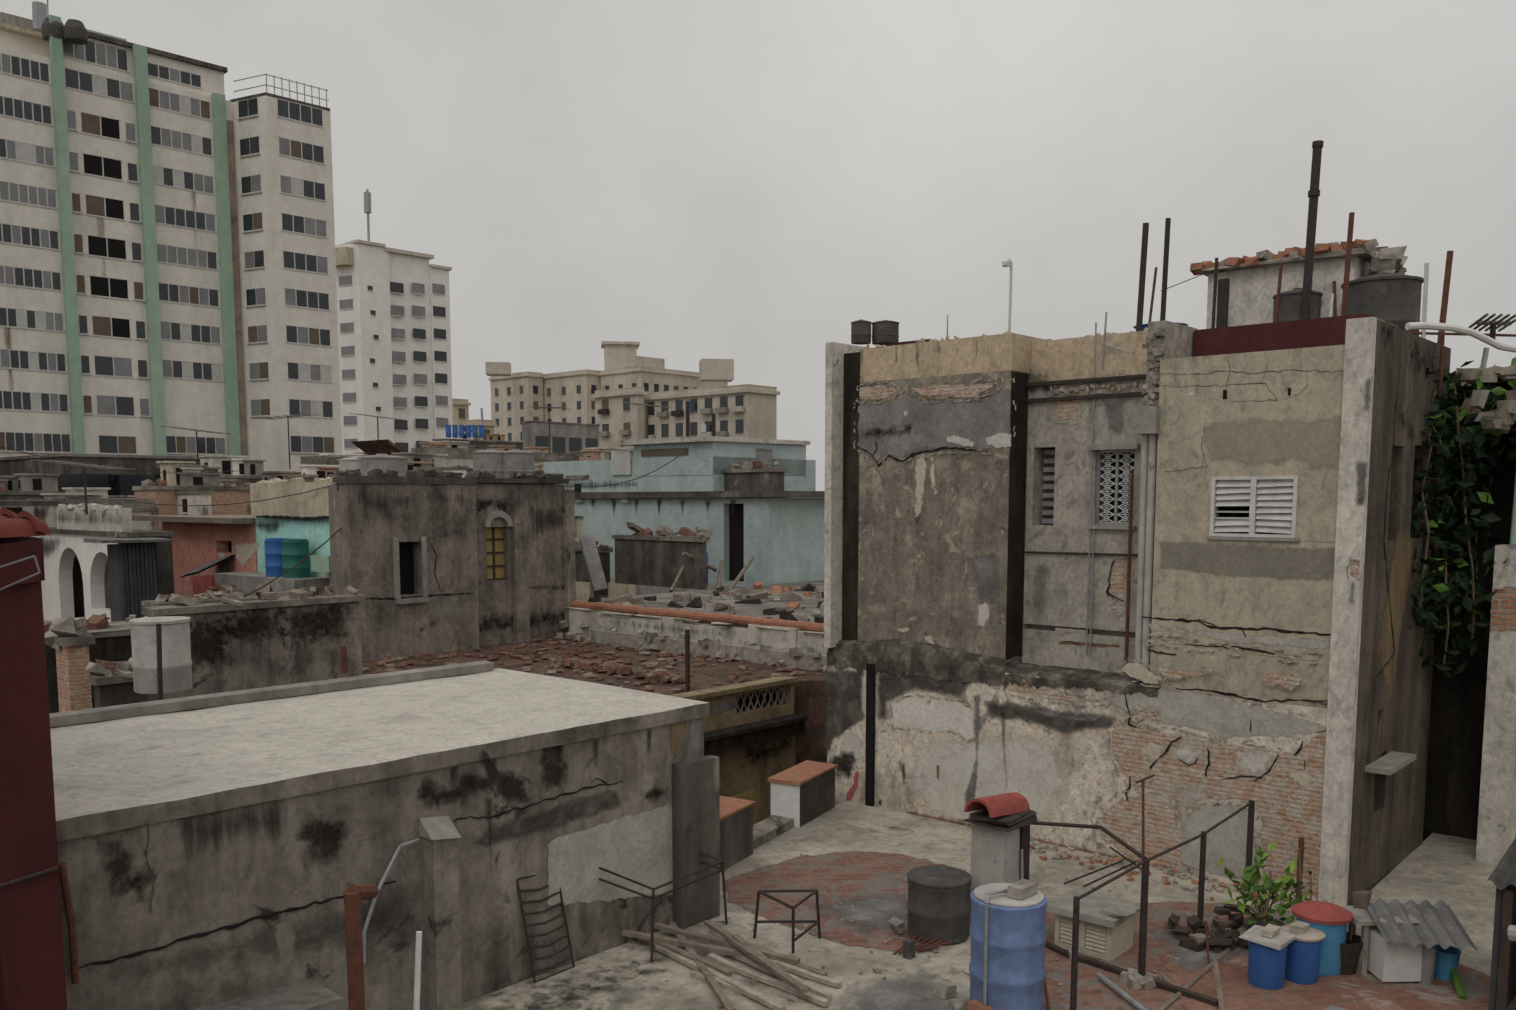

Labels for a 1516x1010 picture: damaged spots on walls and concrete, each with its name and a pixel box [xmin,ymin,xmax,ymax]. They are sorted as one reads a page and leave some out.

flaking render [856,377,1004,416]
flaking render [946,433,1011,471]
flaking render [1490,586,1516,632]
flaking render [994,679,1113,707]
flaking render [1115,659,1227,690]
crack [1106,559,1331,731]
leakage [541,745,567,787]
peeling [890,694,1069,833]
crack [1125,736,1305,801]
leakage [419,761,618,845]
flaking render [1090,707,1326,897]
crack [79,824,396,969]